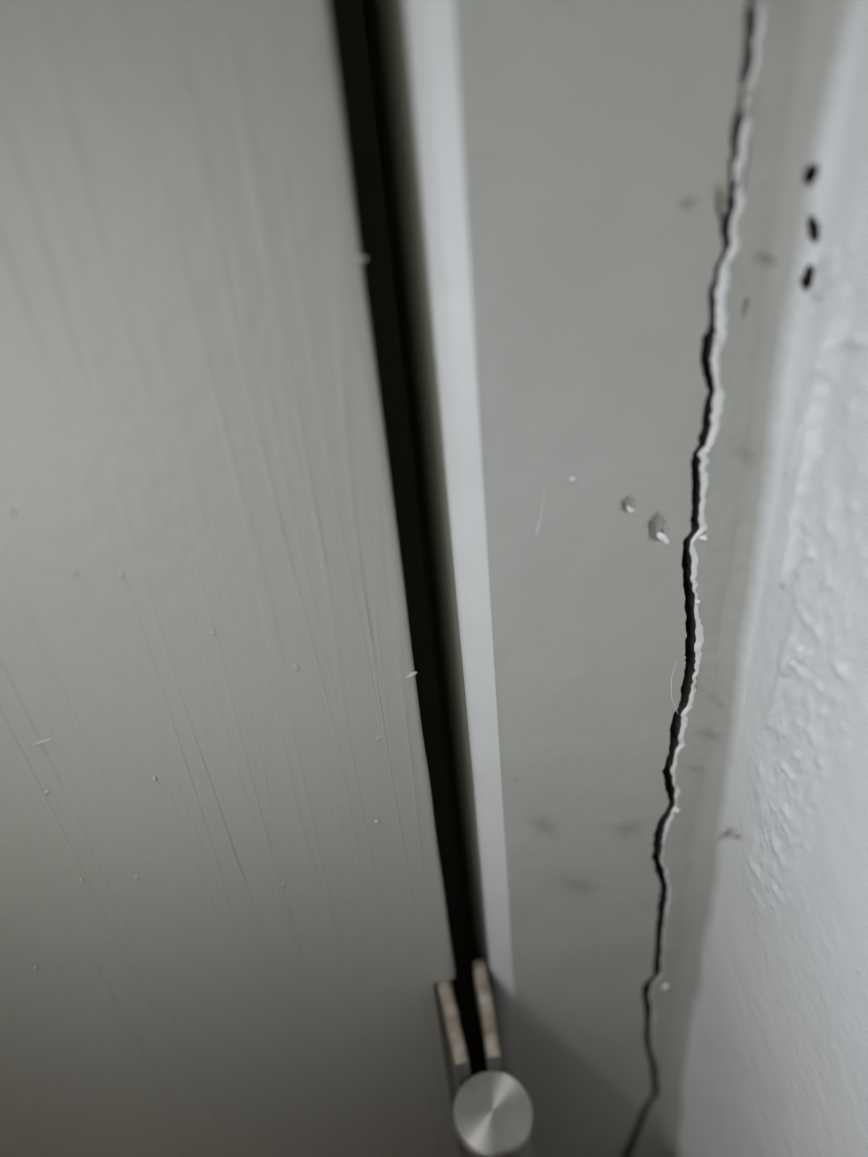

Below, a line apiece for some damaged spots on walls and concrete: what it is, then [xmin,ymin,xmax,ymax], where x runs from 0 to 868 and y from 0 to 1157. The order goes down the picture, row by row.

crack [621,0,765,1157]